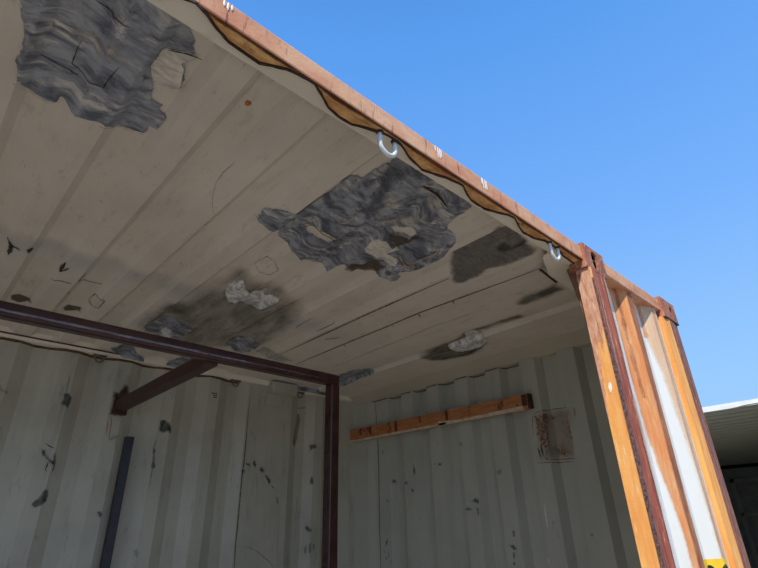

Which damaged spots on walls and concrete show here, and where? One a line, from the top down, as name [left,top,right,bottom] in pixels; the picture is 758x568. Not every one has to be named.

peeling [151,48,196,89]
corrosion [201,6,583,262]
peeling [365,239,439,267]
peeling [160,327,175,338]
leakage [423,338,480,360]
corrosion [609,288,726,568]